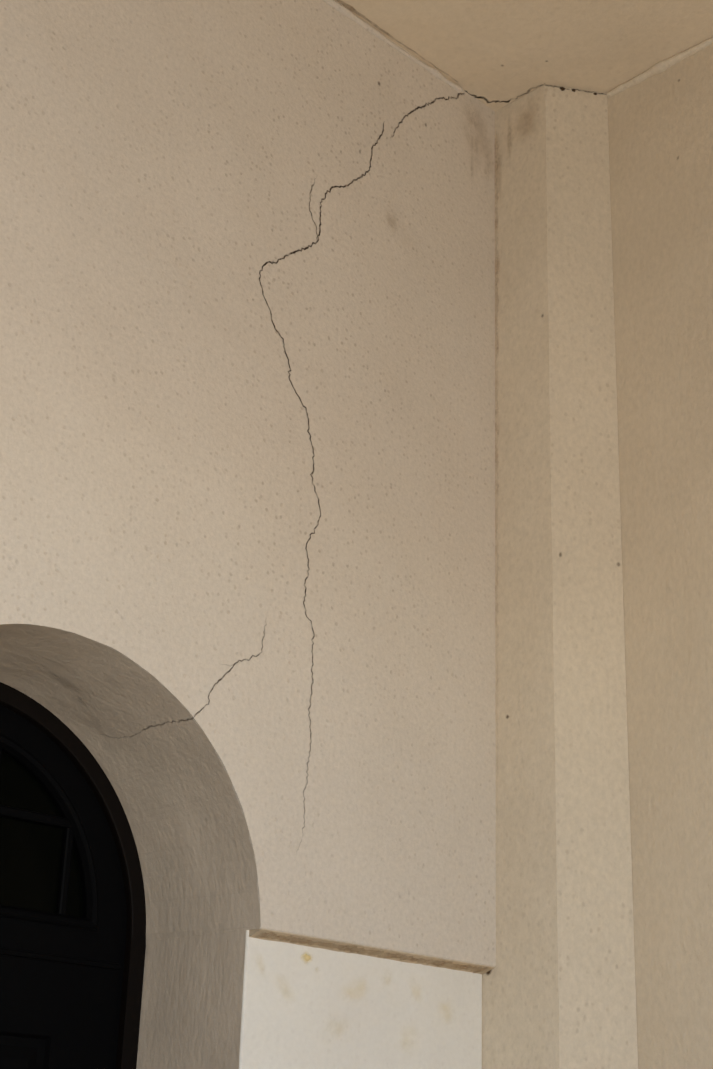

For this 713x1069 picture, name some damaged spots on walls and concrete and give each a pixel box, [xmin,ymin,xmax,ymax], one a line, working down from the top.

crack [148,639,263,728]
crack [259,85,607,828]